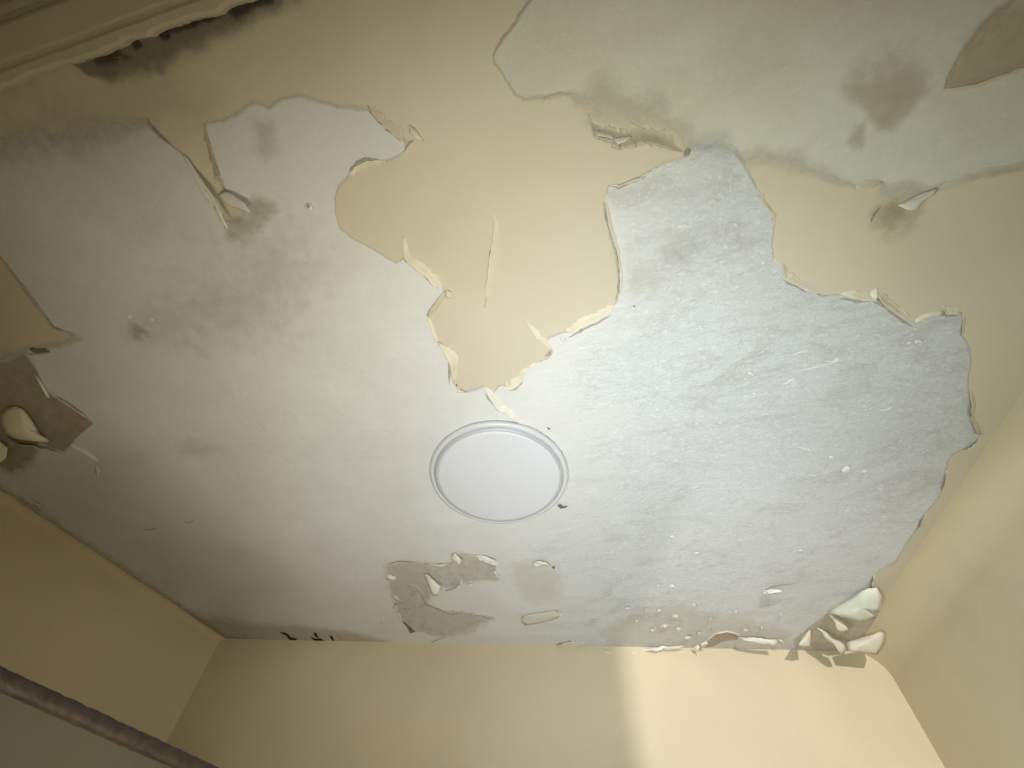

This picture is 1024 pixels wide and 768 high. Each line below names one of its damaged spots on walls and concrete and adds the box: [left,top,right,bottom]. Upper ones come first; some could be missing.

mould [77,0,281,78]
peeling [493,0,1024,211]
peeling [0,96,984,655]